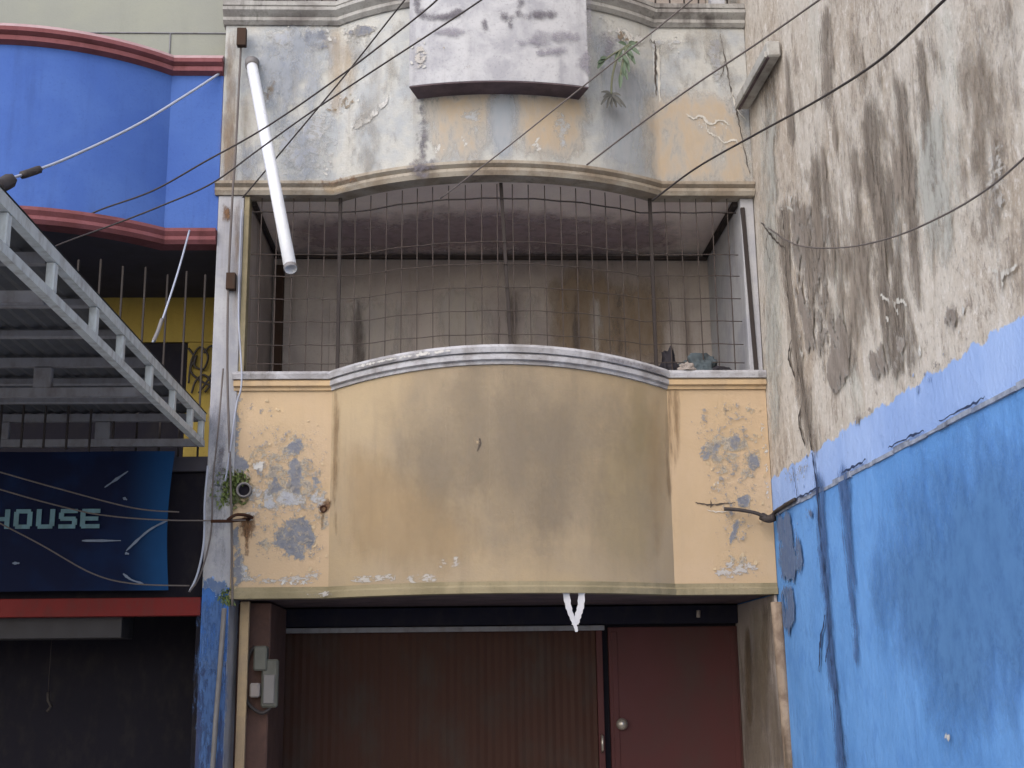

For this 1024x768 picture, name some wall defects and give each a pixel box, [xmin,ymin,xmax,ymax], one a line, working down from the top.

crack [650,39,661,102]
peeling [644,88,754,181]
crack [687,34,750,172]
damp [760,7,1016,451]
damp [341,301,408,363]
damp [550,271,664,370]
spalling [868,329,922,379]
corrosion [241,514,255,548]
peeling [203,394,330,597]
spalling [694,402,812,636]
damp [814,474,847,768]
damp [838,466,858,666]